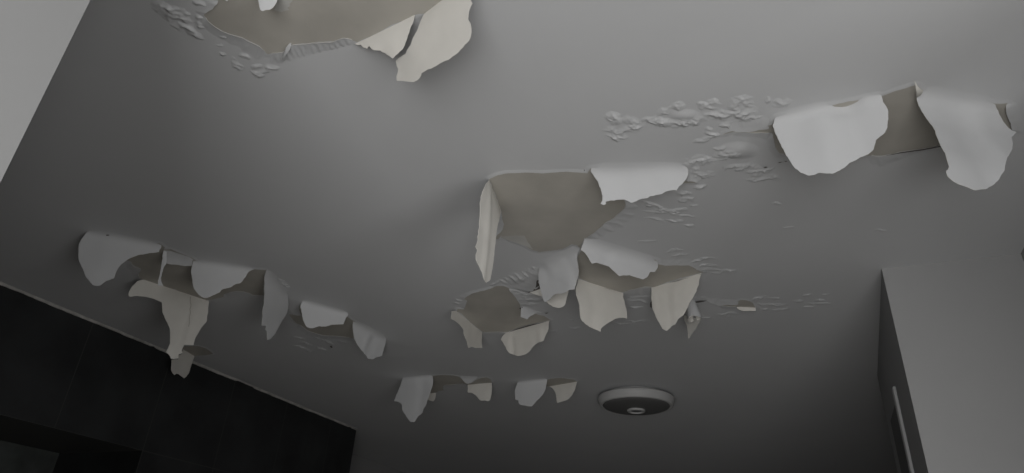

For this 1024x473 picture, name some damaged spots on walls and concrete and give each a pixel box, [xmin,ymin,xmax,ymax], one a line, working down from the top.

peeling [194,0,473,82]
peeling [720,81,1024,191]
peeling [78,230,386,378]
peeling [451,162,707,356]
peeling [394,374,494,422]
peeling [515,377,579,406]